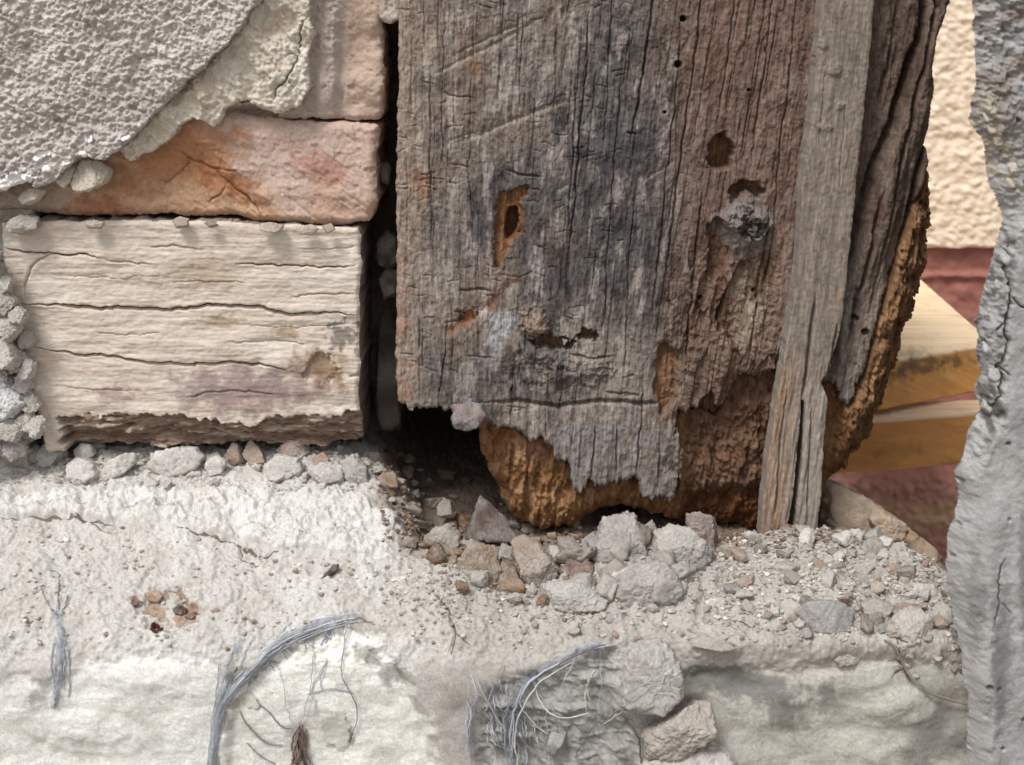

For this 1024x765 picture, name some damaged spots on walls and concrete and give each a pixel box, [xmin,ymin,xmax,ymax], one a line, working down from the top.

spalling [120,0,318,161]
spalling [0,134,113,205]
crack [163,149,261,214]
crack [7,248,103,259]
crack [230,261,354,269]
crack [25,303,347,315]
crack [42,348,293,372]
crack [1,512,113,534]
crack [177,526,278,568]
crack [993,559,1013,629]